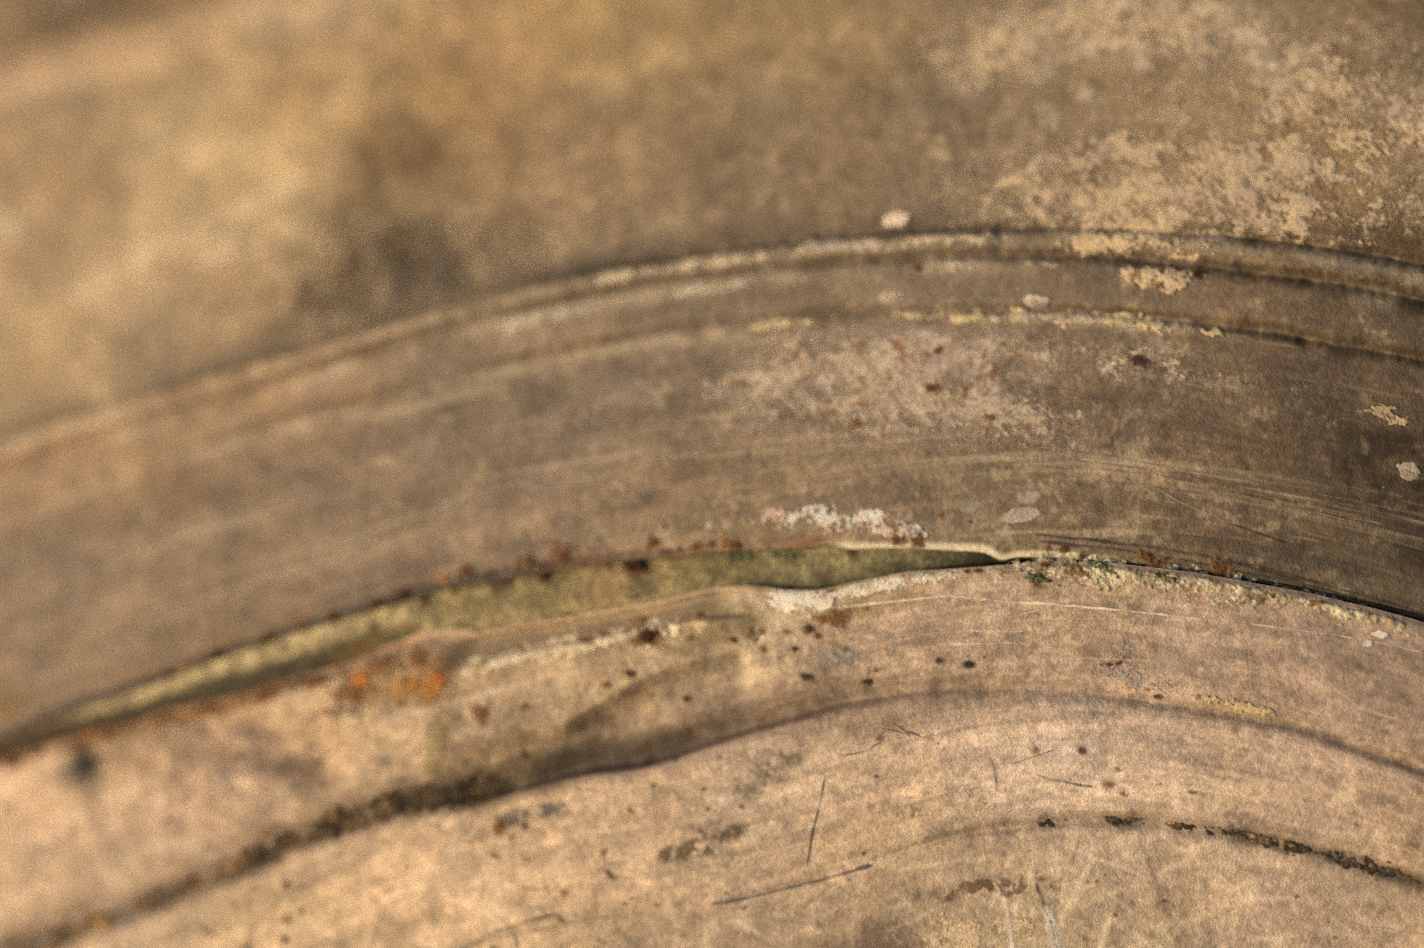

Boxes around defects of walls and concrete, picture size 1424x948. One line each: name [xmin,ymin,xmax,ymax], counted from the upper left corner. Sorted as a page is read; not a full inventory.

rust [605,525,742,575]
rust [367,544,574,629]
rust [206,633,273,663]
crack [0,545,1083,759]
rust [629,618,667,648]
rust [730,628,766,652]
rust [783,607,868,652]
rust [237,646,446,720]